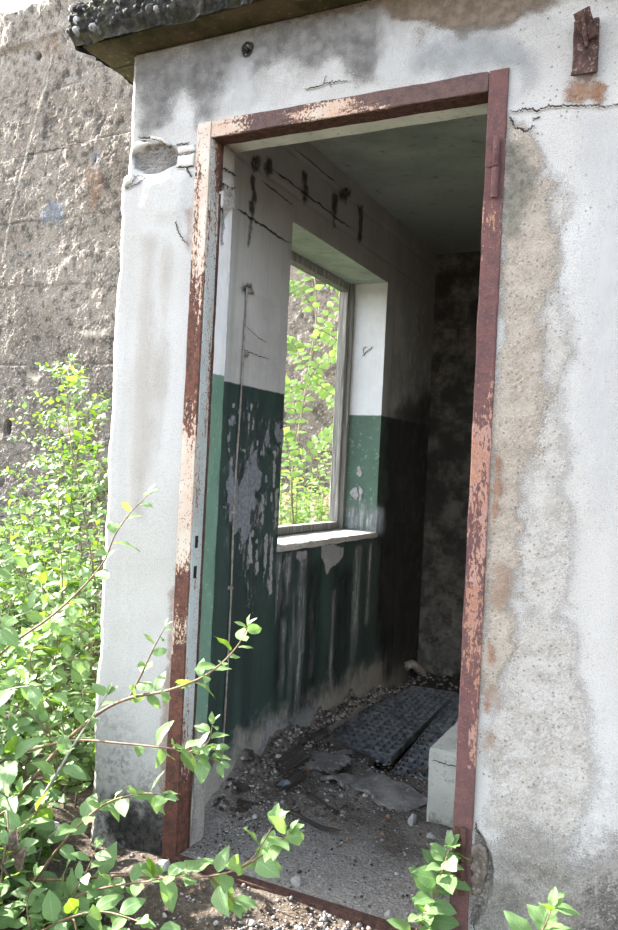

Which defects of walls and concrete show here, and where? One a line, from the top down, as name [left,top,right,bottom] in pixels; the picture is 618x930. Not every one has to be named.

spalling [124,136,196,188]
crack [305,76,351,91]
leakage [133,0,557,136]
crack [509,103,618,133]
corrosion [562,78,608,107]
peeling [222,403,284,603]
peeling [321,544,344,574]
leakage [329,394,431,683]
flaking render [470,118,603,925]
leakage [276,556,318,719]